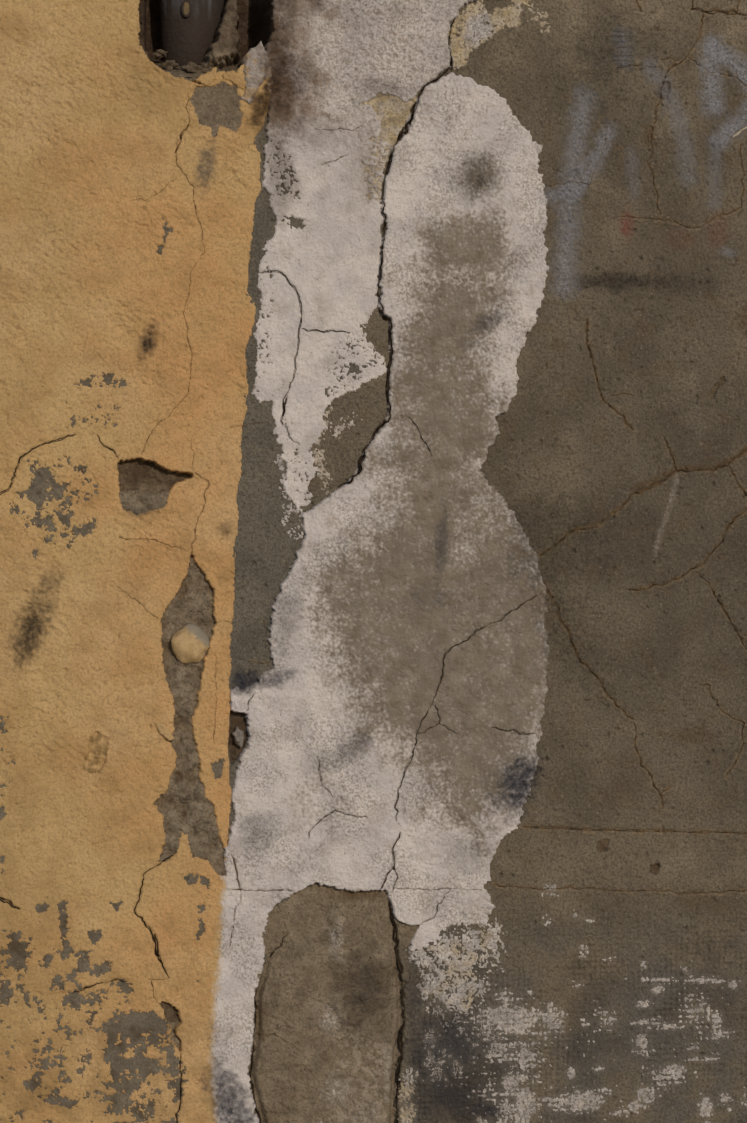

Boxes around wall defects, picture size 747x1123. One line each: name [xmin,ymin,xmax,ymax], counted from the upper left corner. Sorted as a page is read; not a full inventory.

spalling [138,0,275,137]
peeling [448,0,551,70]
crack [0,93,205,495]
crack [232,270,350,445]
peeling [9,455,98,559]
spalling [117,459,191,515]
spalling [153,555,248,889]
crack [380,437,747,1123]
crack [72,855,173,1003]
crack [227,854,292,946]
peeling [0,900,189,1123]
crack [249,990,299,1123]